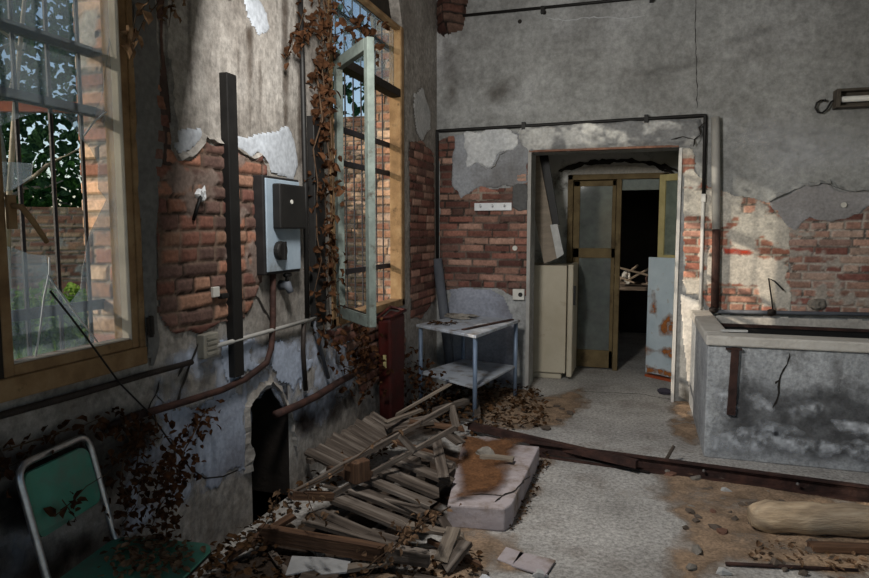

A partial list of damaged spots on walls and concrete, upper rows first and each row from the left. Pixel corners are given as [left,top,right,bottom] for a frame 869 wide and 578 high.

peeling [244,0,269,35]
spalling [436,0,469,39]
flaking render [155,0,228,334]
crack [558,158,678,174]
flaking render [238,126,298,319]
flaking render [408,88,528,319]
flaking render [680,148,869,386]
rust [660,316,673,334]
crack [772,353,790,408]
leakage [713,387,869,457]